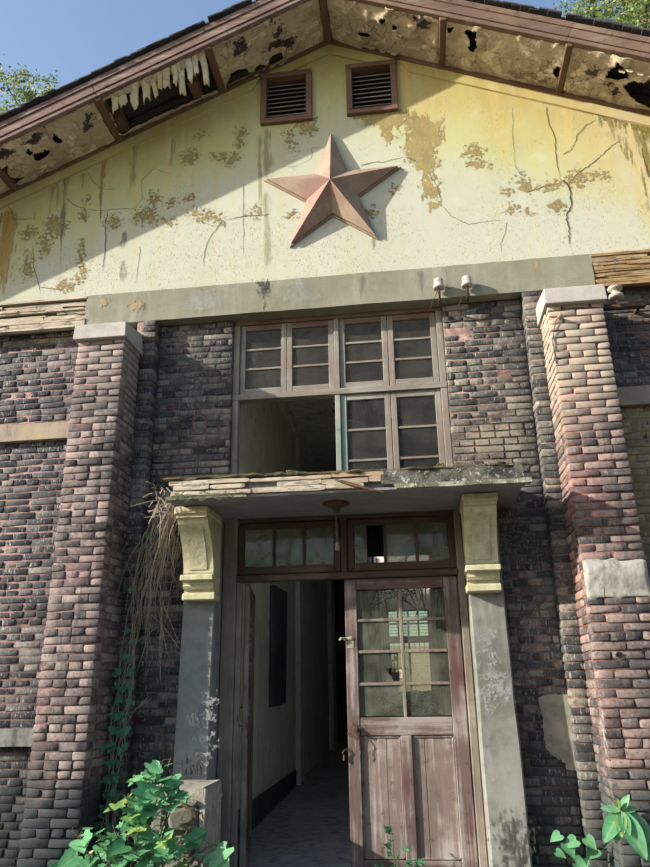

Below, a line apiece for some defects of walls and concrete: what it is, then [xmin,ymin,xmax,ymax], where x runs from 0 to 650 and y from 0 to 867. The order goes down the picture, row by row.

damp [0,211,18,288]
peeling [17,194,91,283]
peeling [53,238,90,294]
crack [64,169,166,270]
peeling [103,189,226,230]
peeling [178,125,249,170]
crack [203,184,269,262]
peeling [279,116,319,154]
peeling [353,108,447,213]
peeling [460,142,493,170]
crack [512,108,622,244]
damp [598,116,650,196]